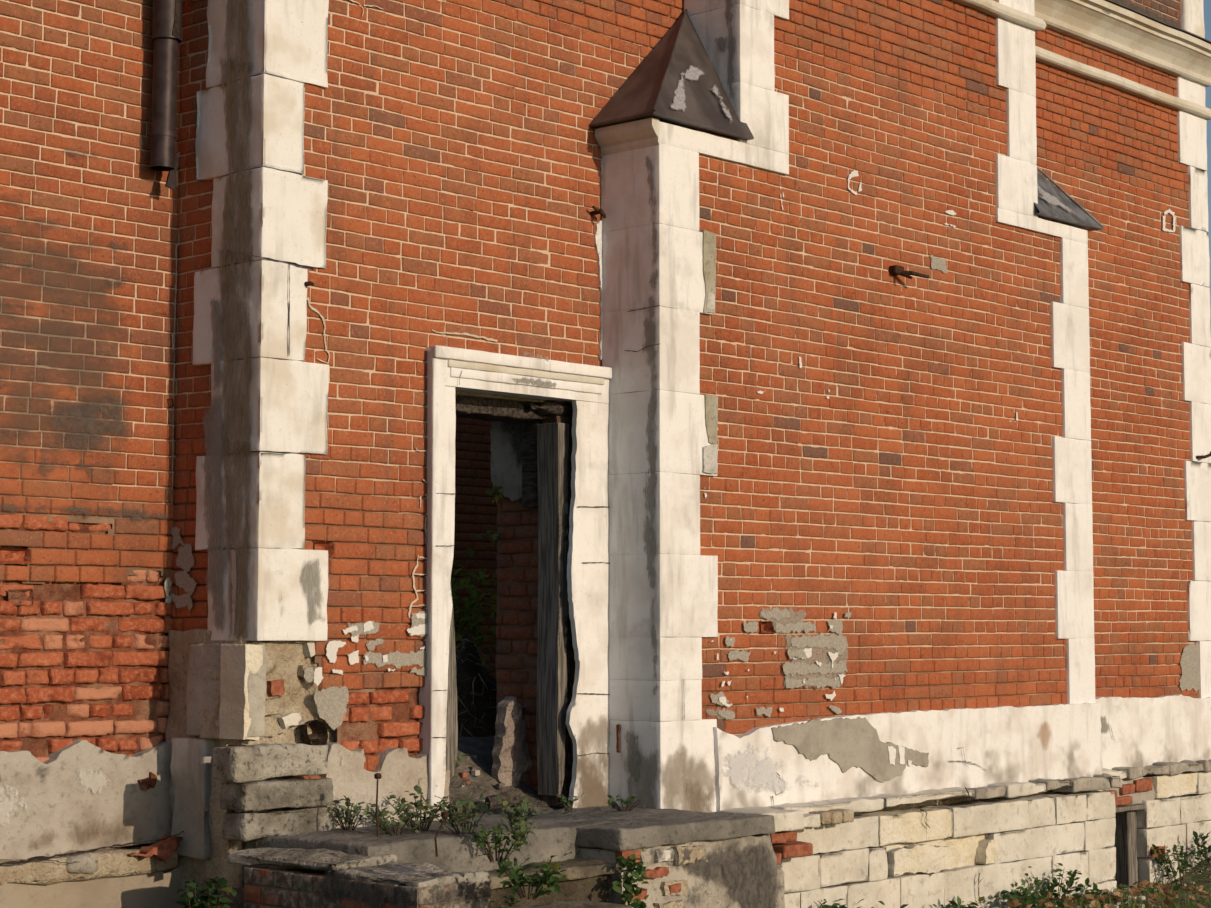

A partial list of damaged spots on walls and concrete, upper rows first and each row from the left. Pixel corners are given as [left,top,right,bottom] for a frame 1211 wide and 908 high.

water stain [643,157,658,694]
water stain [301,560,325,624]
peeling [407,613,428,650]
hole [759,620,775,633]
peeling [711,641,732,707]
peeling [793,648,845,701]
spalling [137,772,157,790]
spalling [200,621,450,829]
water stain [626,732,640,782]
peeling [771,708,929,783]
spalling [126,835,183,861]
spalling [615,845,723,908]